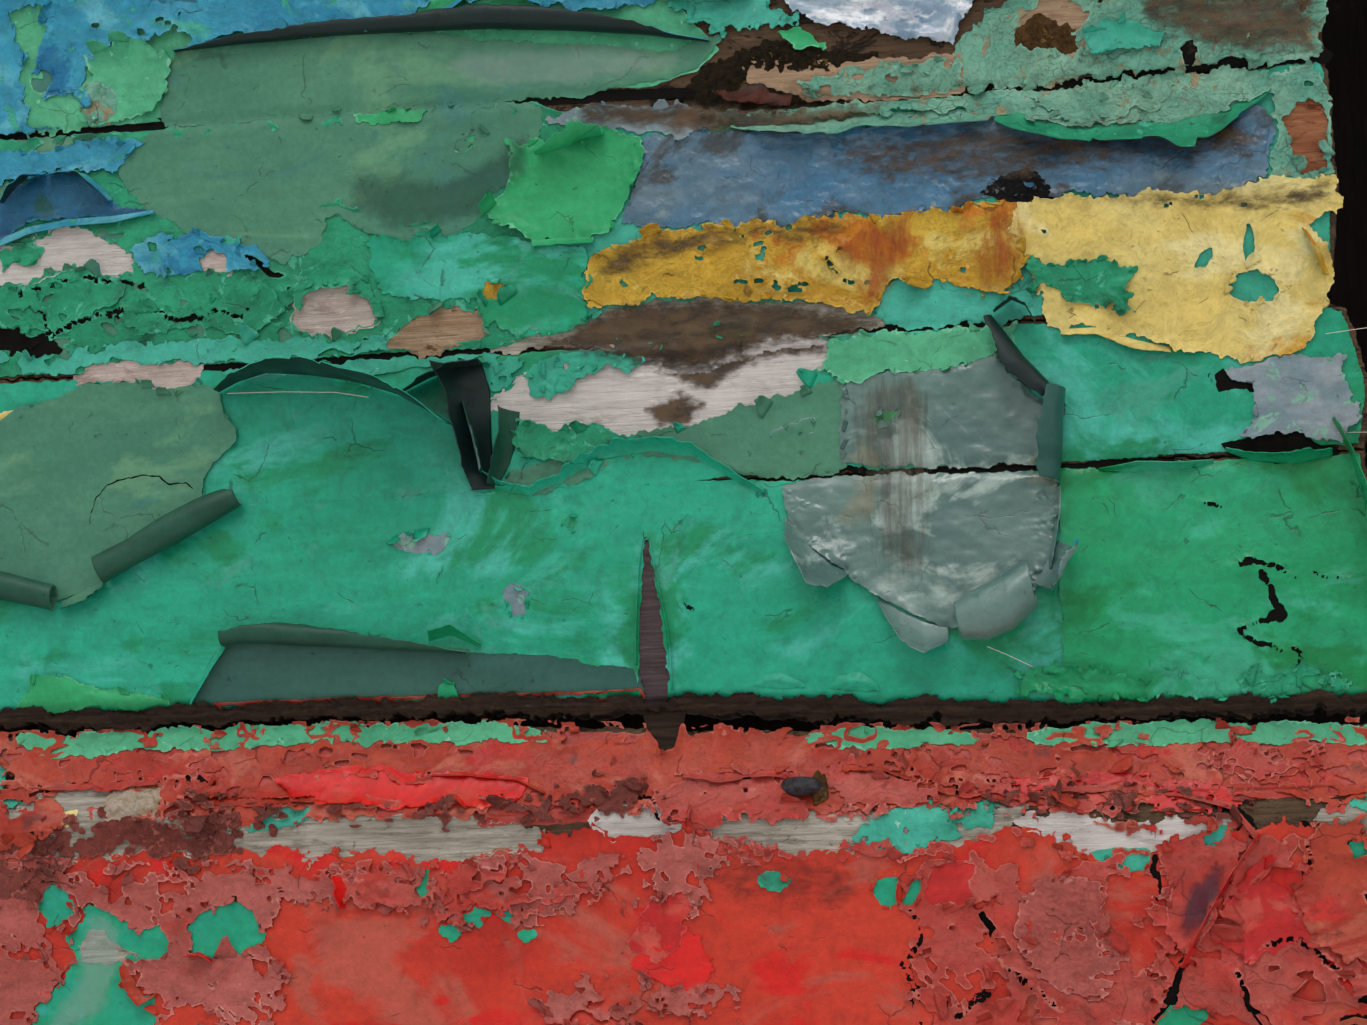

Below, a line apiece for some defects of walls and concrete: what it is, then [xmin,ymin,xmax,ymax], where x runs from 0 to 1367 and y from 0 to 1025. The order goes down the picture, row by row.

peeling [0,0,1362,653]
corrosion [844,219,909,298]
peeling [16,531,673,759]
peeling [1013,659,1352,703]
crack [1237,557,1339,665]
peeling [0,718,1367,1025]